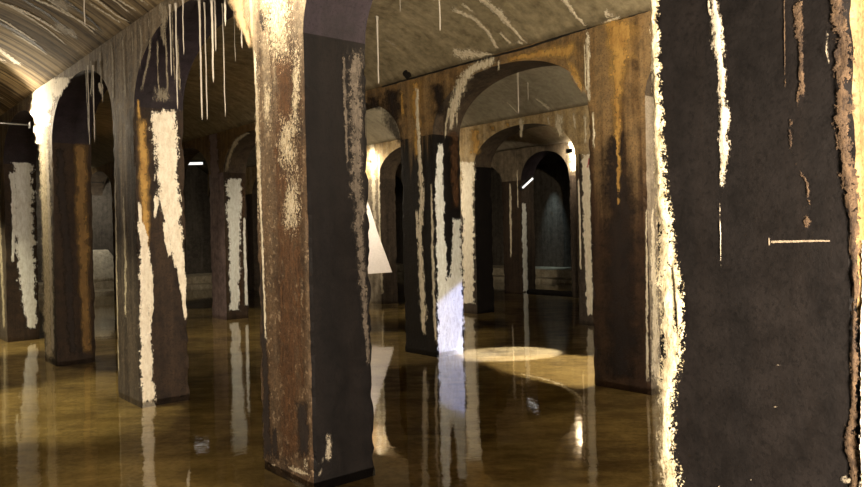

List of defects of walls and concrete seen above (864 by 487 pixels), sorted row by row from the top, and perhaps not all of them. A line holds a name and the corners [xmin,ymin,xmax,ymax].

peeling [8,162,39,329]
leakage [0,0,181,132]
corrosion [137,101,150,245]
peeling [148,109,187,320]
peeling [225,178,248,310]
corrosion [269,52,310,460]
corrosion [401,82,421,155]
corrosion [441,131,459,206]
leakage [451,0,526,62]
corrosion [509,43,583,91]
corrosion [606,21,632,205]
peeling [672,256,685,346]